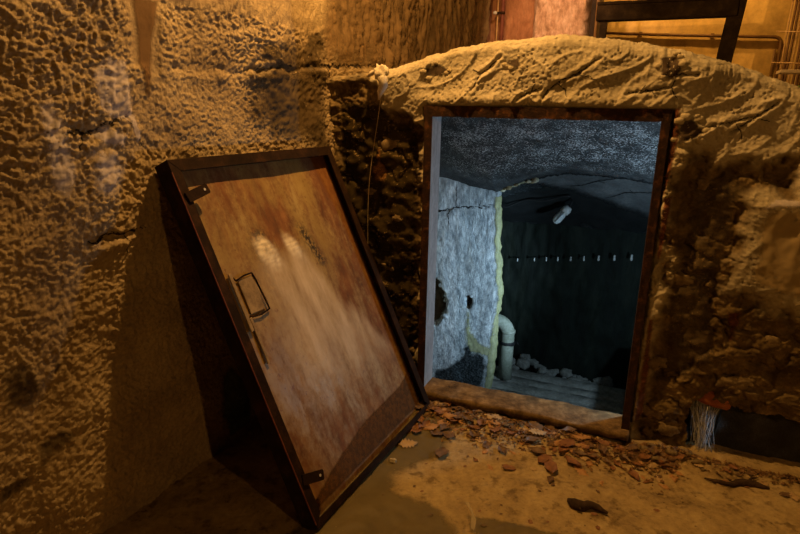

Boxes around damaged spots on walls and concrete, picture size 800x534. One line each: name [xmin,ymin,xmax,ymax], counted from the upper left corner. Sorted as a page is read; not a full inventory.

crack [44,116,144,151]
crack [539,172,653,198]
crack [438,188,491,223]
crack [87,226,146,252]
peeling [342,103,419,368]
spalling [434,279,447,323]